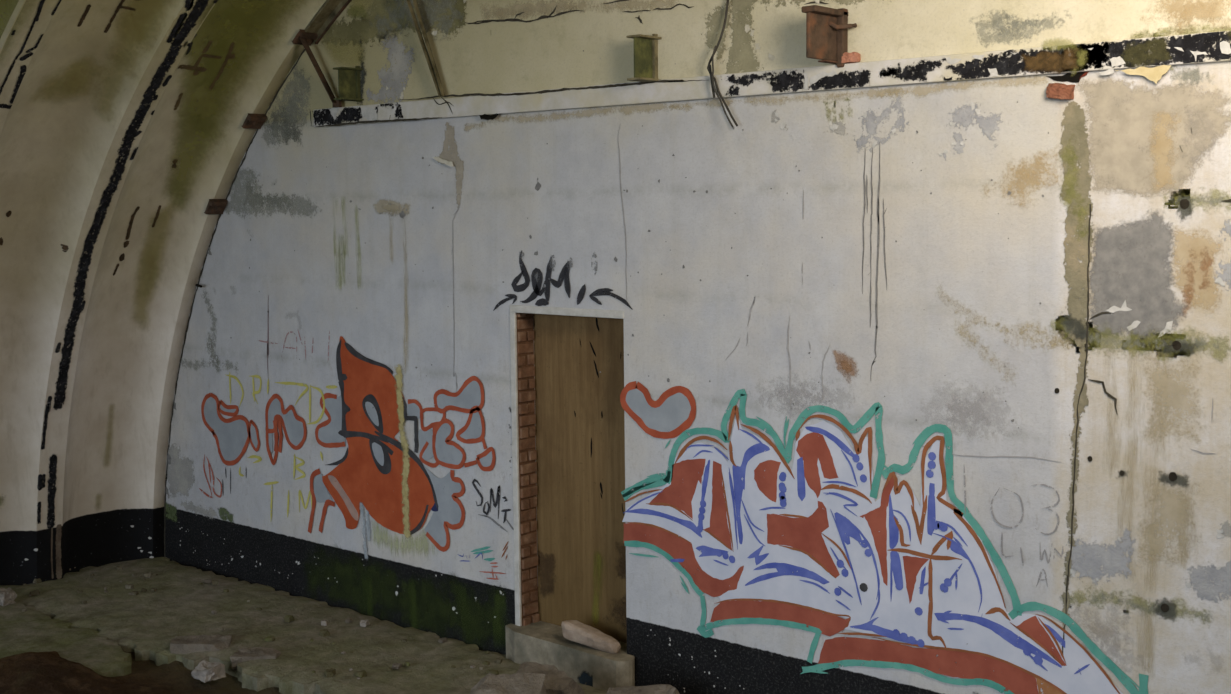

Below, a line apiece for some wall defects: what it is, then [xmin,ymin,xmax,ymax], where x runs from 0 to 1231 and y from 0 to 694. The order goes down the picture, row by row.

peeling [701,0,1231,219]
crack [922,100,1118,653]